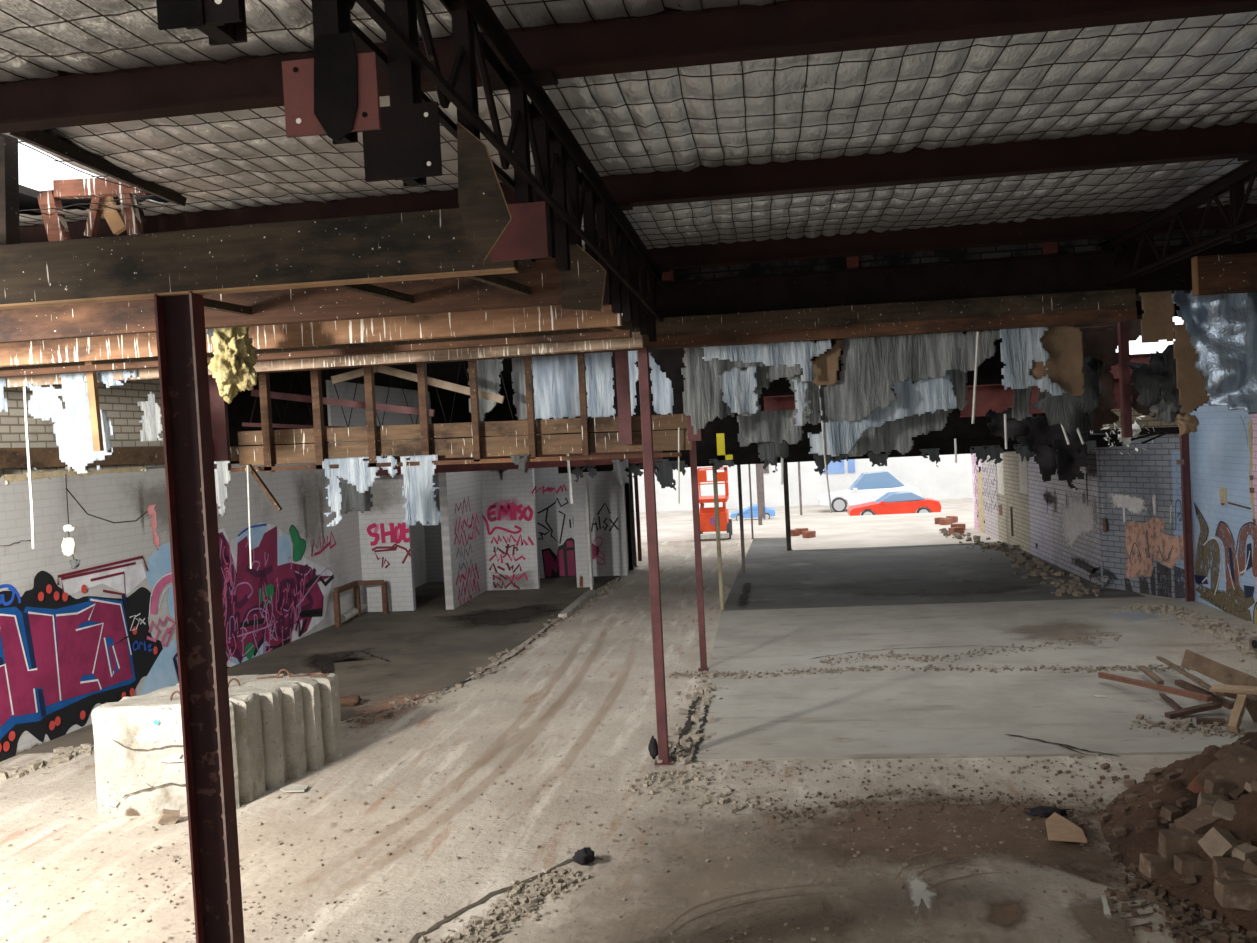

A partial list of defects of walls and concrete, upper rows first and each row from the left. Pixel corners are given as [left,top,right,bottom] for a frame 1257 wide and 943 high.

crack [669,697,711,762]
crack [409,858,573,943]